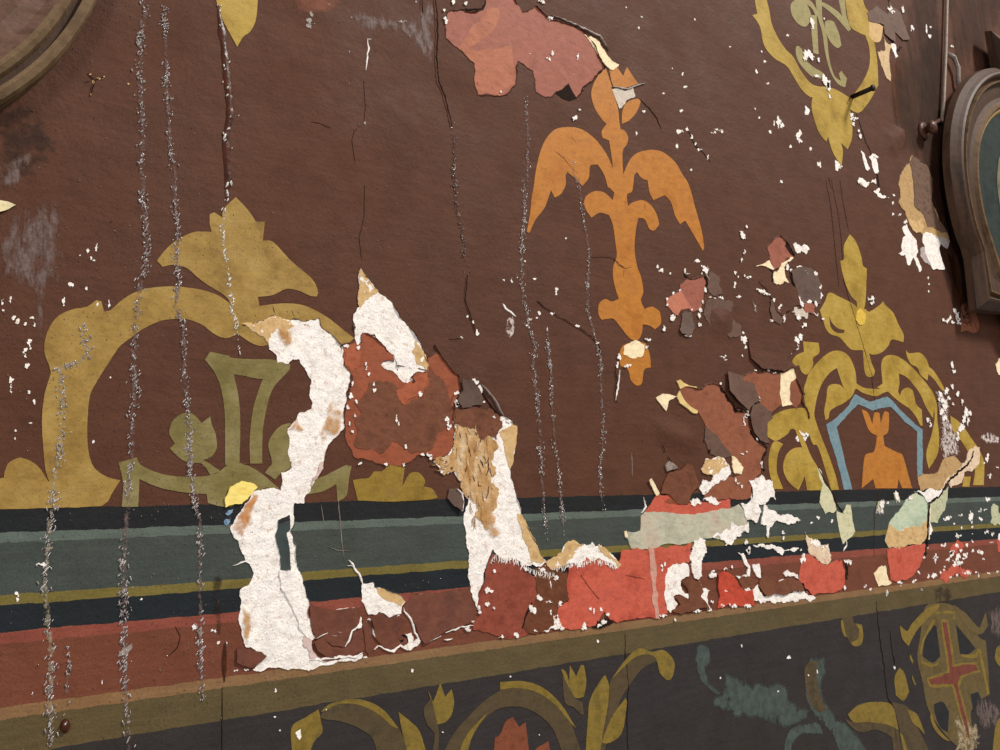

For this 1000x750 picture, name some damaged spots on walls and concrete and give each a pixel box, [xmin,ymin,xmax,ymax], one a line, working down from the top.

crack [306,5,352,29]
crack [348,38,371,159]
crack [397,0,452,125]
peeling [443,0,619,121]
peeling [612,83,661,128]
damp [124,0,169,500]
damp [161,60,221,701]
peeling [224,225,855,673]
damp [518,96,566,540]
peeling [850,113,950,293]
peeling [864,446,1000,596]
damp [116,514,136,748]